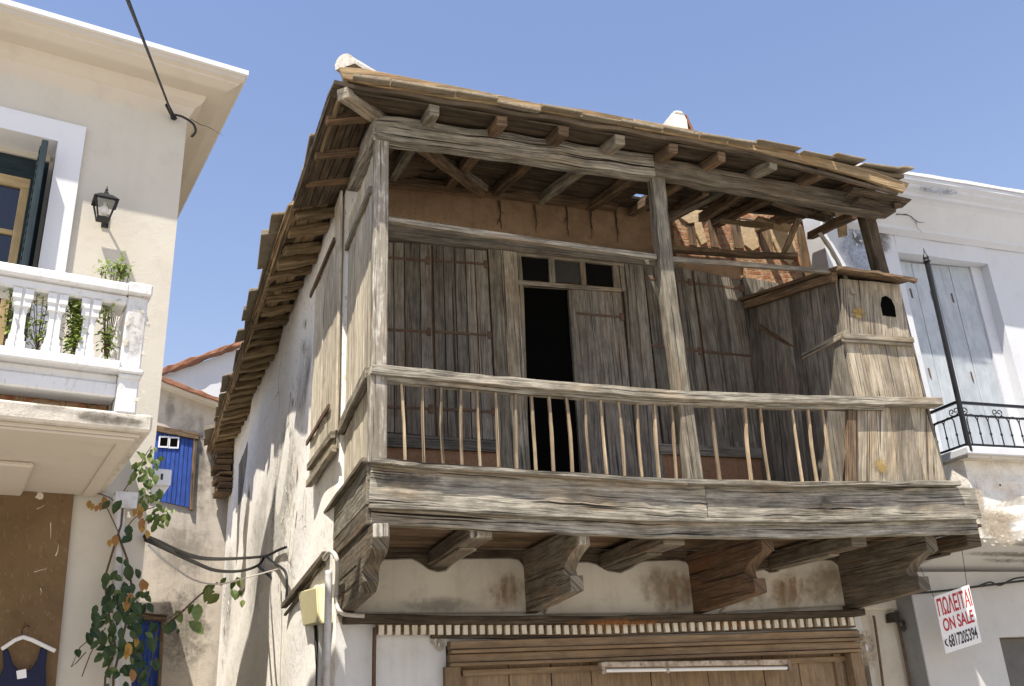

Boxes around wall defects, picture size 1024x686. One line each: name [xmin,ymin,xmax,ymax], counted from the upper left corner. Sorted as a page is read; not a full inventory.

crack [496,201,504,229]
crack [564,207,620,243]